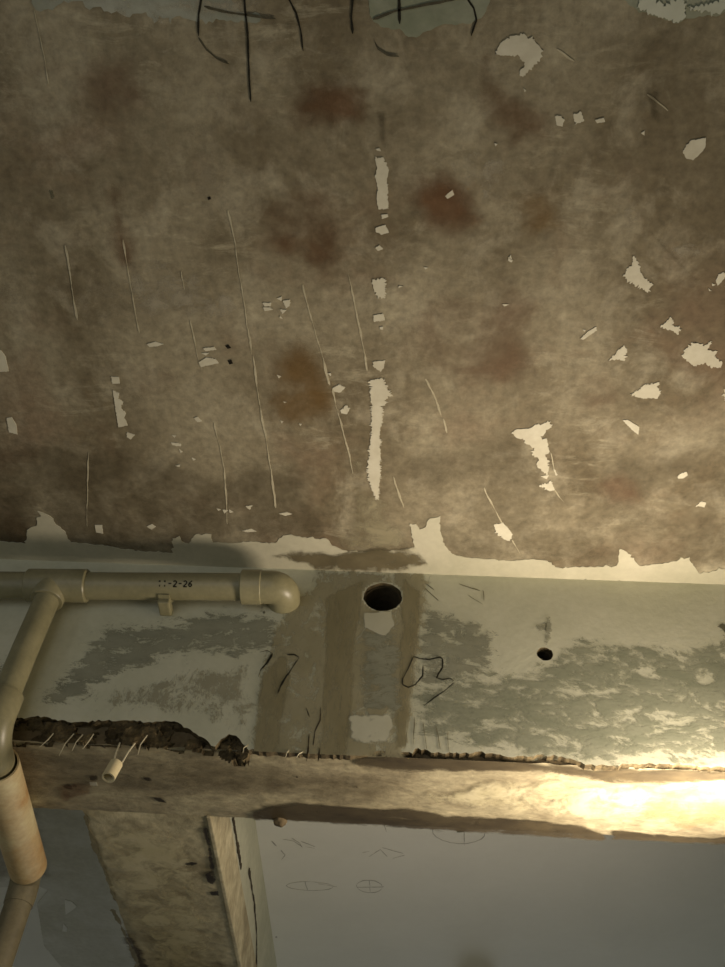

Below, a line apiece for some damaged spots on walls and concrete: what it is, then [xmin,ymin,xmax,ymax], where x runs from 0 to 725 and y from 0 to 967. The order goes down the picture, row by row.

peeling [0,511,725,585]
spalling [12,718,250,767]
damp [444,782,723,824]
damp [107,831,209,963]